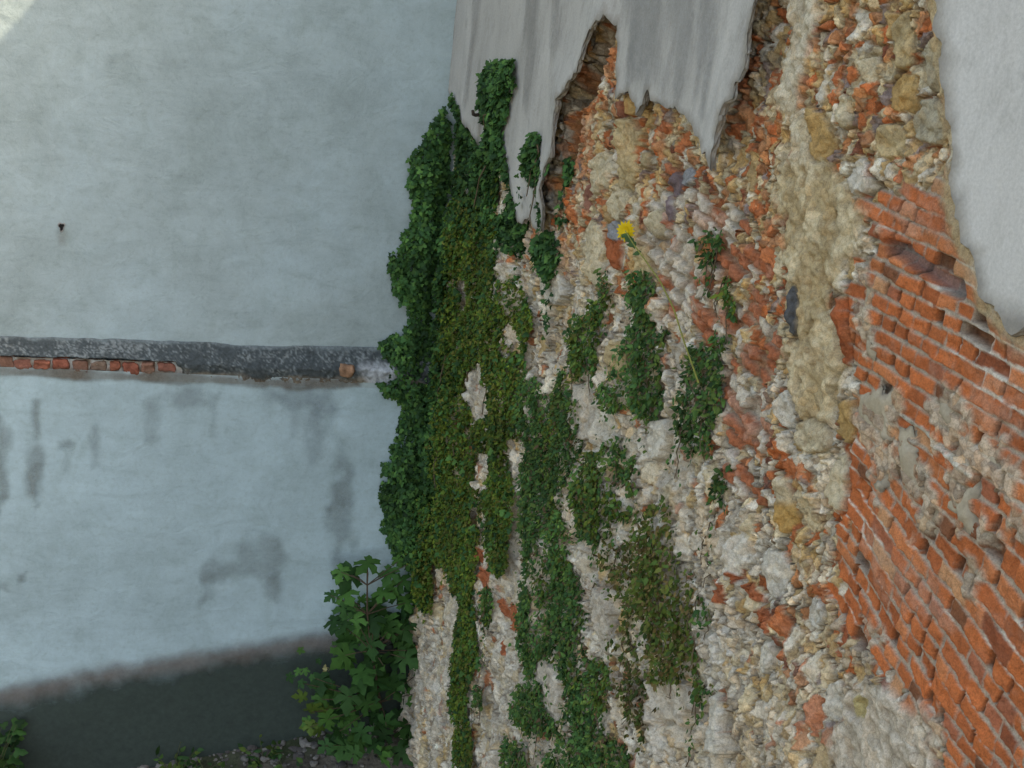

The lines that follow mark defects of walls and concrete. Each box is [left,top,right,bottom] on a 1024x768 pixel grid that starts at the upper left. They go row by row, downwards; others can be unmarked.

spalling [0,355,182,375]
spalling [397,0,1024,768]
leakage [0,636,410,768]